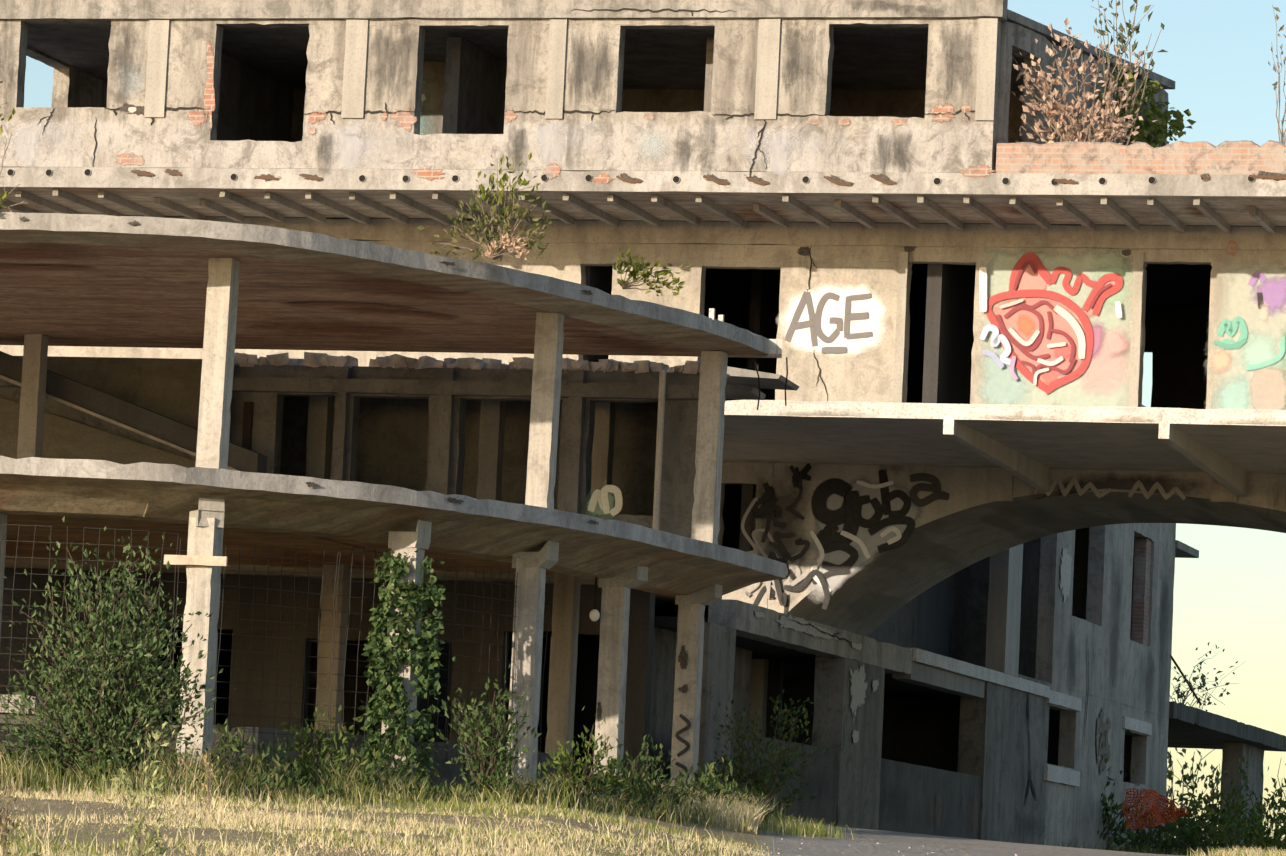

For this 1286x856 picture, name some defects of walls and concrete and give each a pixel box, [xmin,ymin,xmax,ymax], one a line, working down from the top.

crack [37,109,54,135]
crack [92,107,119,165]
spalling [112,103,145,115]
crack [151,107,211,125]
peeling [188,42,215,129]
crack [712,113,826,182]
crack [807,247,817,292]
crack [813,353,828,401]
peeling [755,611,880,743]